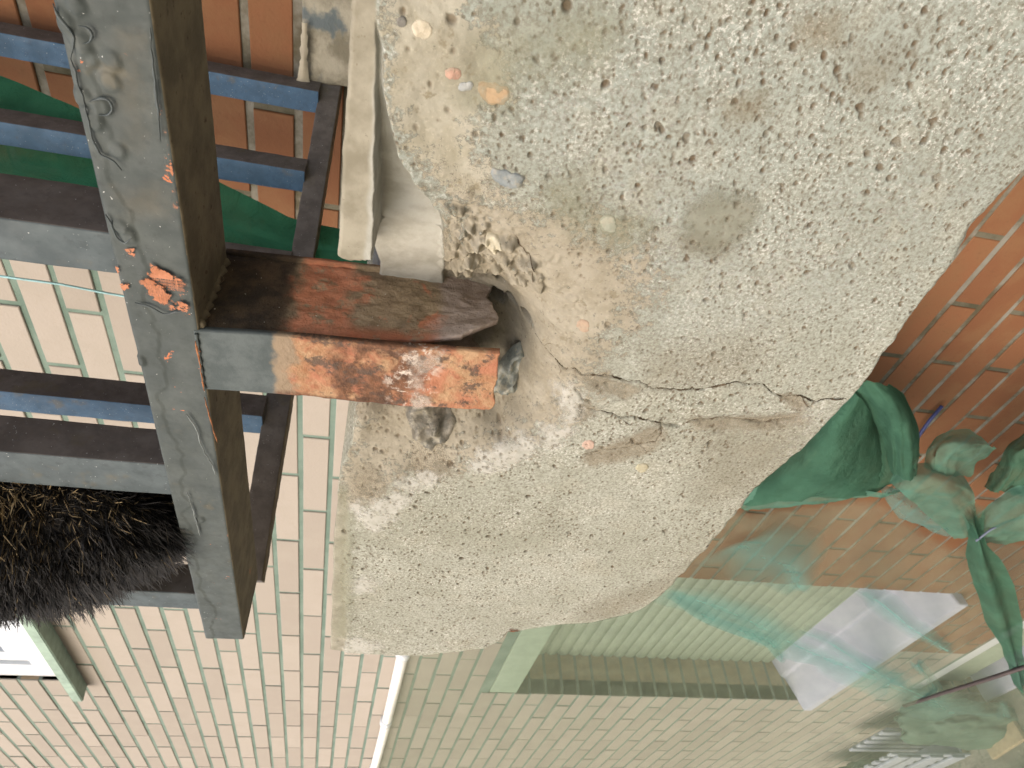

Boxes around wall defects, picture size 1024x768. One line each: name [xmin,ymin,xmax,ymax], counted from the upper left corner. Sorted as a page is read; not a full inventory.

spalling [338,0,679,515]
peeling [116,263,190,315]
corrosion [195,341,217,441]
damp [543,388,580,446]
crack [530,320,849,452]
damp [474,431,534,473]
damp [351,472,437,531]